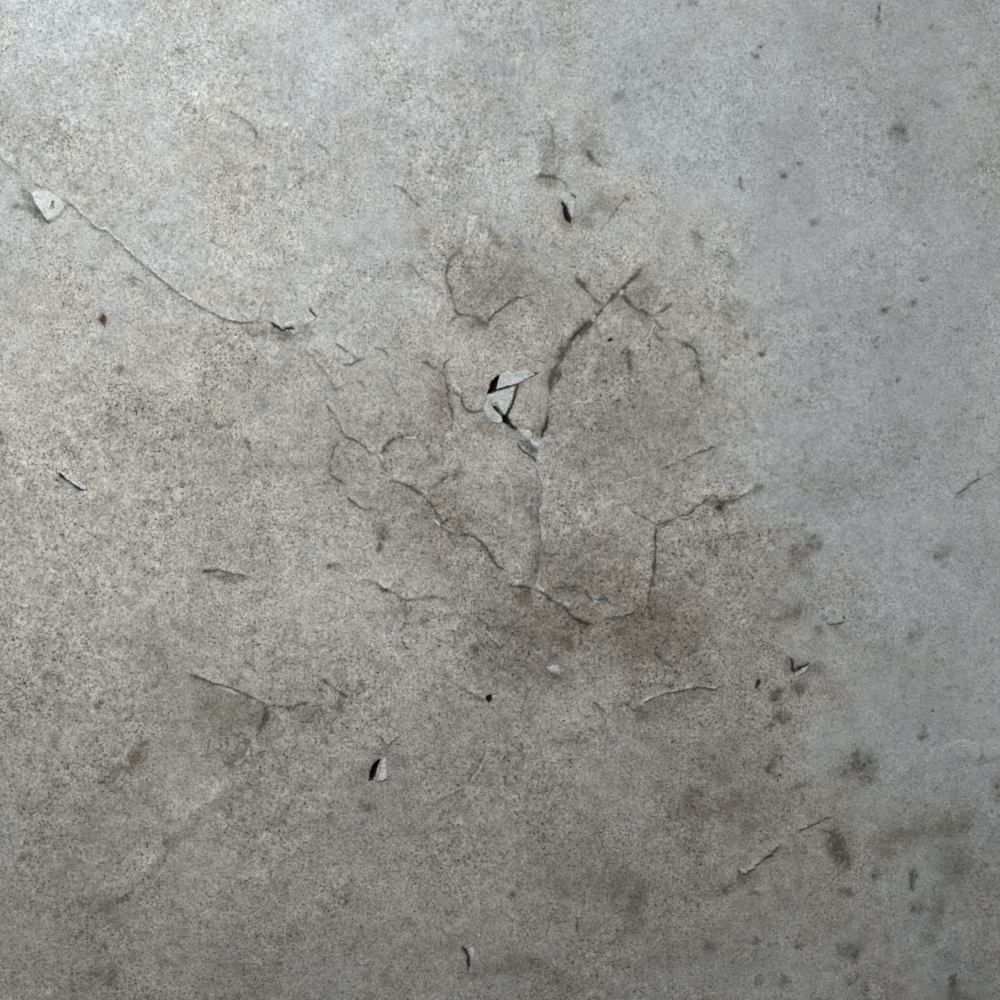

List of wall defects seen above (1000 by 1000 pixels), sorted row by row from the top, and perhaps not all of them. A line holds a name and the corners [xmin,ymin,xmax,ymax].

flaking render [15,185,325,340]
crack [446,215,530,325]
crack [549,270,670,388]
crack [315,345,417,464]
crack [421,356,483,417]
flaking render [484,370,551,468]
crack [618,437,727,484]
crack [407,473,598,644]
crack [631,499,738,593]
crack [638,654,718,719]
crack [224,707,269,765]
water stain [827,829,850,864]